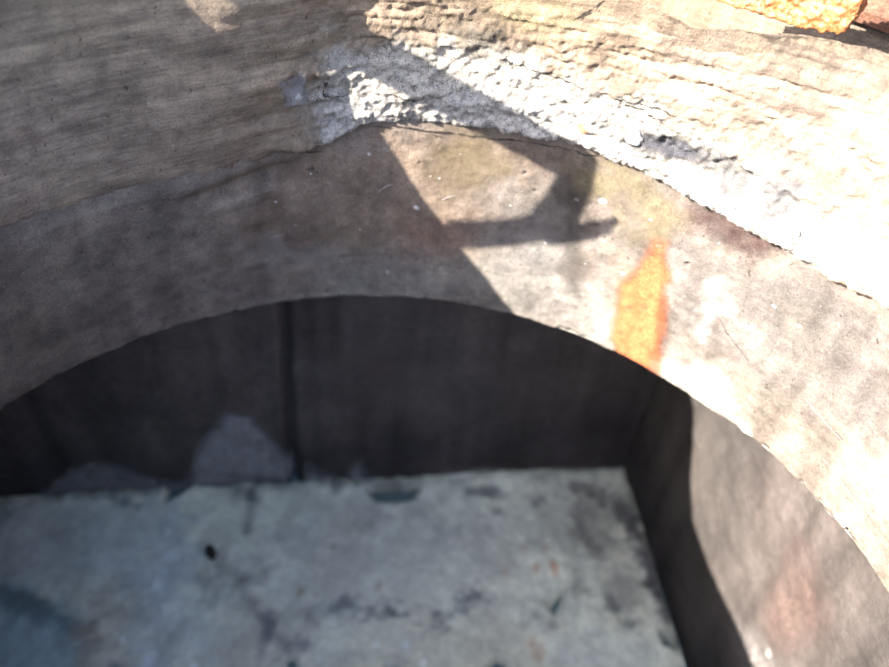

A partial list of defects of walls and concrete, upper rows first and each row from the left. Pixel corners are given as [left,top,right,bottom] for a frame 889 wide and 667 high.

crack [322,82,609,160]
crack [489,29,676,125]
damp [306,31,889,308]
corrosion [611,240,670,371]